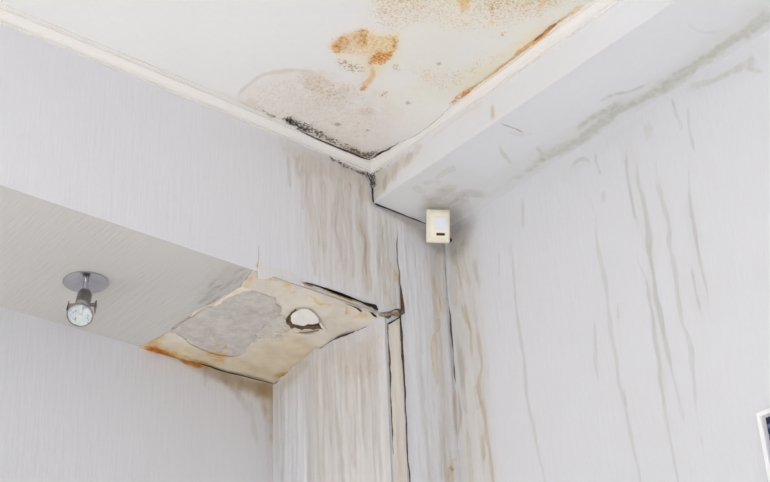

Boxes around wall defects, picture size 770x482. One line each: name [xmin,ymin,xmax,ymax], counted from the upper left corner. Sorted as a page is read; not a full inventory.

damp [282,116,374,158]
damp [330,156,375,196]
peeling [140,271,405,385]
crack [301,235,410,482]